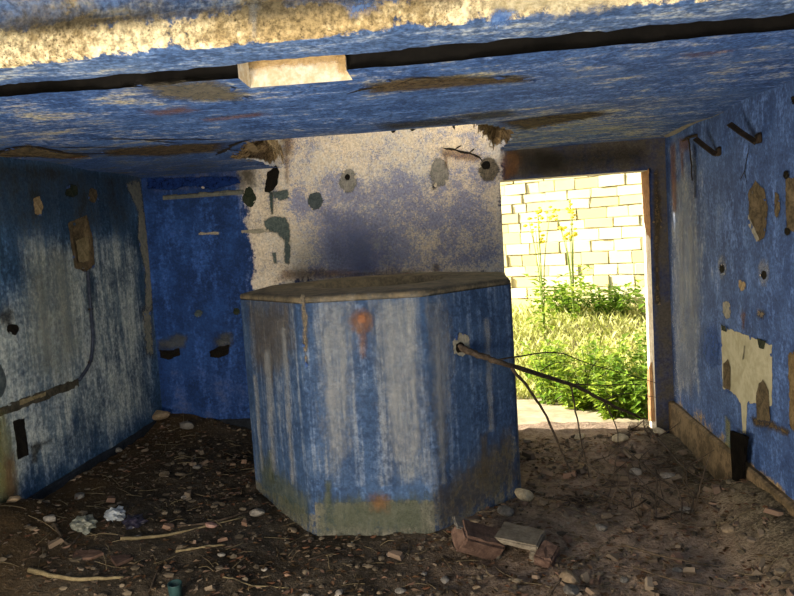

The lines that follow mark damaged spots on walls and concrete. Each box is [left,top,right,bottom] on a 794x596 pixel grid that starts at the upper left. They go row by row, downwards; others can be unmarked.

peeling [101,143,221,157]
peeling [308,192,324,210]
spalling [339,169,358,192]
spalling [430,158,449,189]
spalling [473,112,606,181]
spalling [748,170,794,242]
spalling [68,215,95,272]
peeling [126,140,292,360]
peeling [718,301,794,435]
spalling [0,365,79,460]